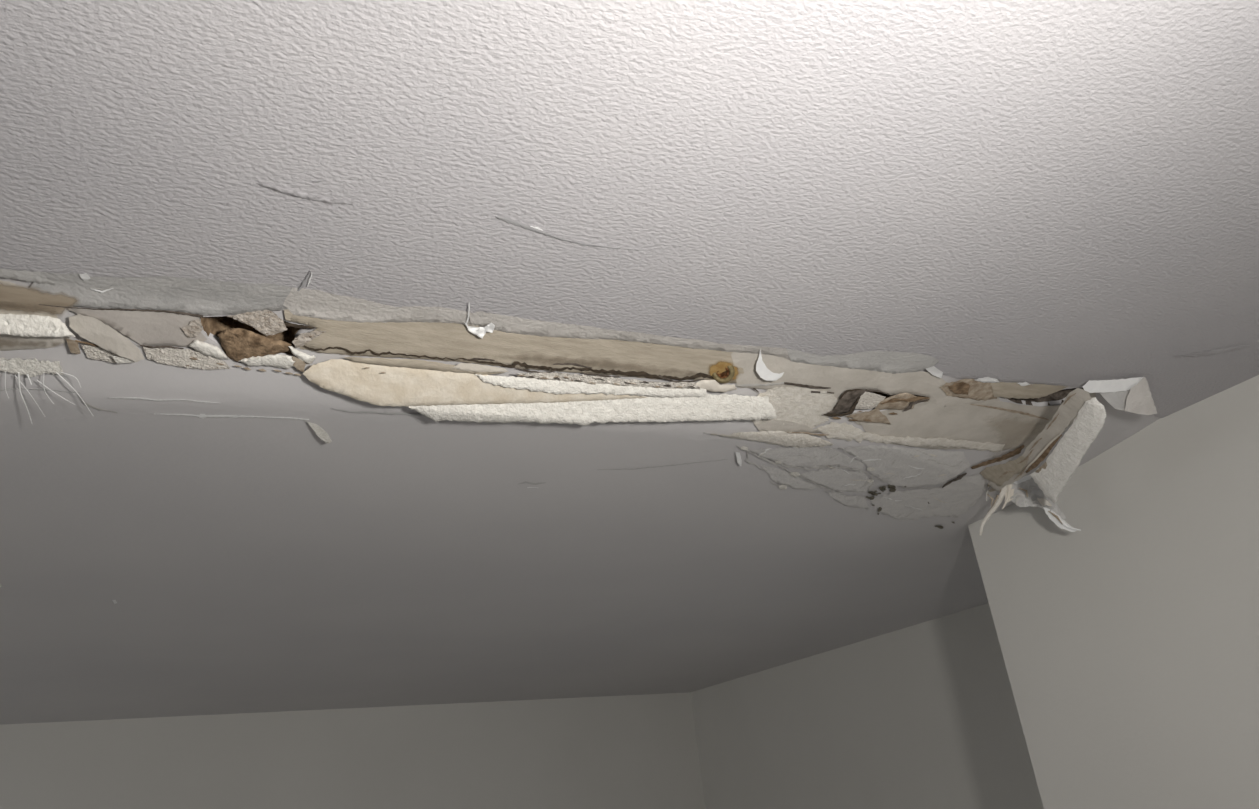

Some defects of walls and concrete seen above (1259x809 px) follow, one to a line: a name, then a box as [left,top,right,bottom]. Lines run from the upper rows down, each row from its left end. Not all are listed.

spalling [497,216,637,250]
spalling [0,269,1096,521]
crack [598,445,1024,498]